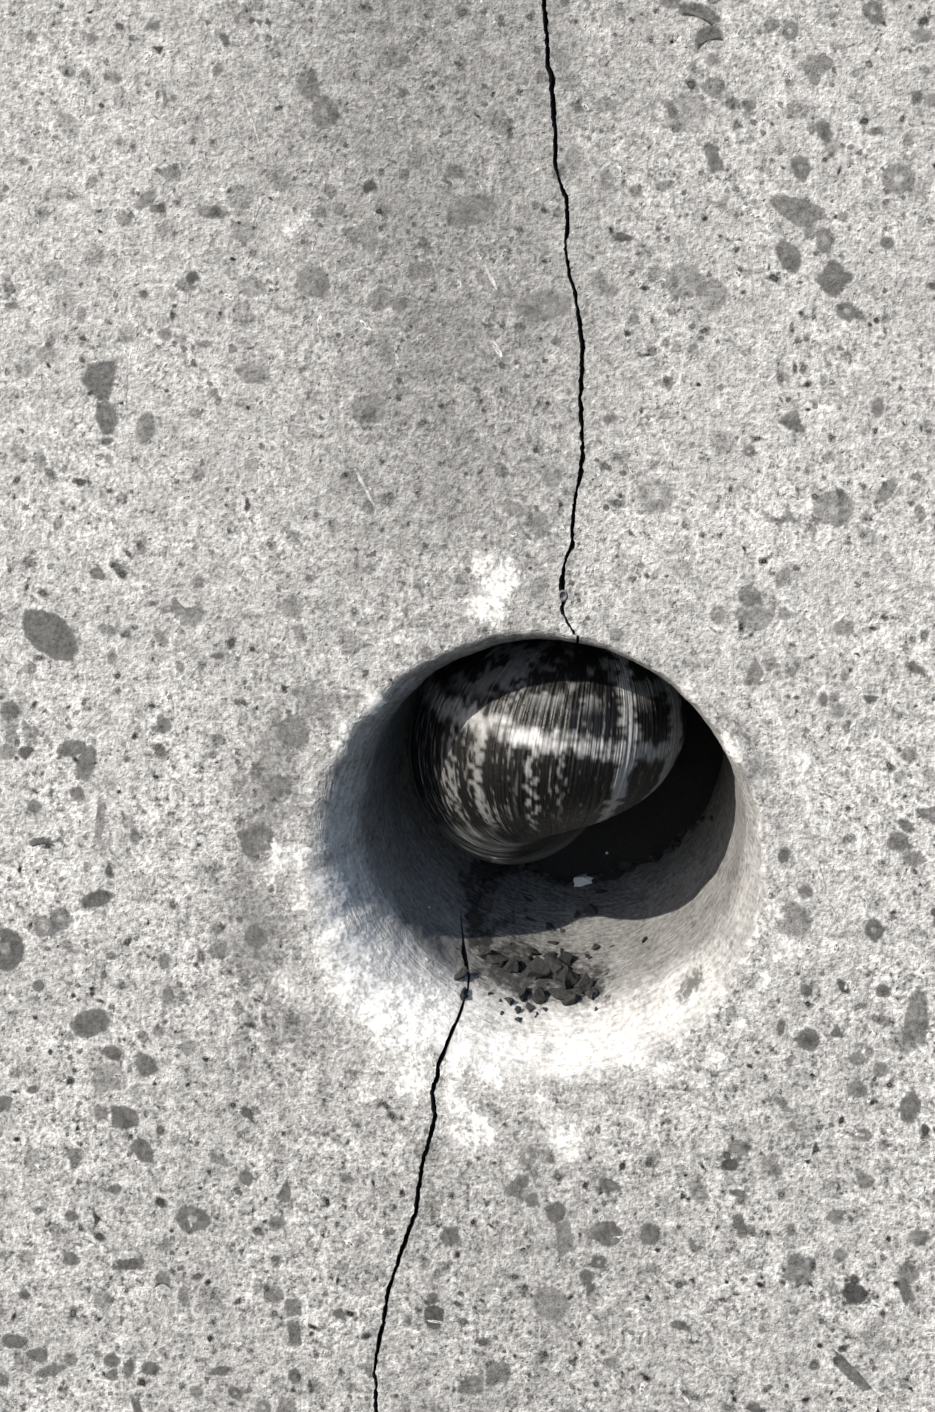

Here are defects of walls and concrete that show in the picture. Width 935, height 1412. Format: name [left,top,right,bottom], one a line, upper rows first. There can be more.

crack [541,0,586,643]
crack [372,905,470,1412]